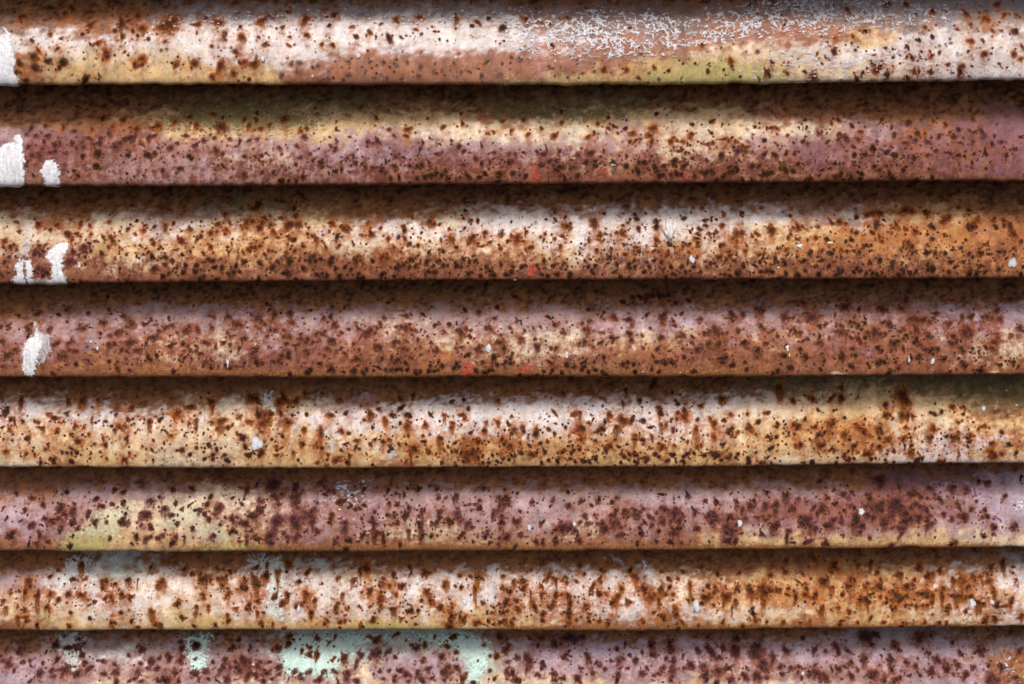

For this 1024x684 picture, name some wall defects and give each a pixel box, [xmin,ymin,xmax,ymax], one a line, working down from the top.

rust [14,9,526,85]
rust [549,43,744,85]
rust [755,49,790,83]
rust [802,1,1024,83]
rust [24,103,1024,186]
rust [0,197,1024,684]